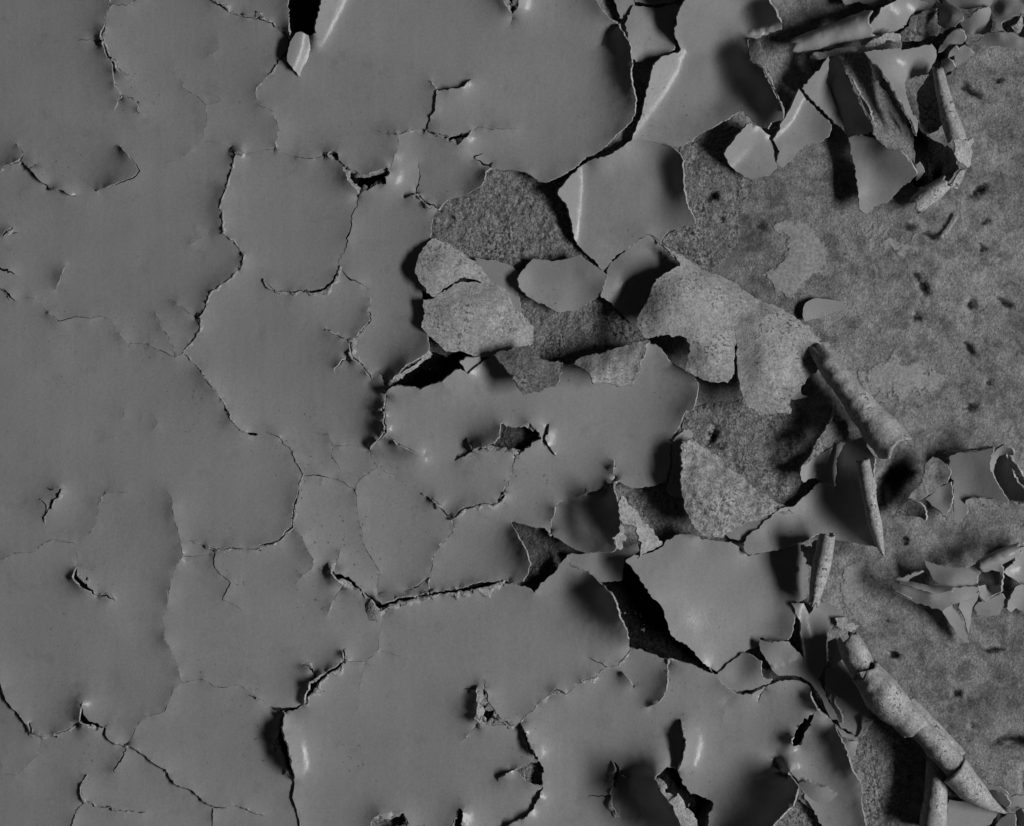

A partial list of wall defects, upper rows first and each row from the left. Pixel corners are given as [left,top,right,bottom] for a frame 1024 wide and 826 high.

crack [78,0,138,103]
crack [212,0,297,76]
crack [405,165,437,211]
crack [0,268,15,301]
crack [148,130,394,557]
peeling [388,0,1024,826]
crack [73,544,117,601]
crack [322,456,516,621]
crack [250,648,365,779]
crack [473,650,631,774]
crack [75,774,145,814]
crack [589,761,626,818]